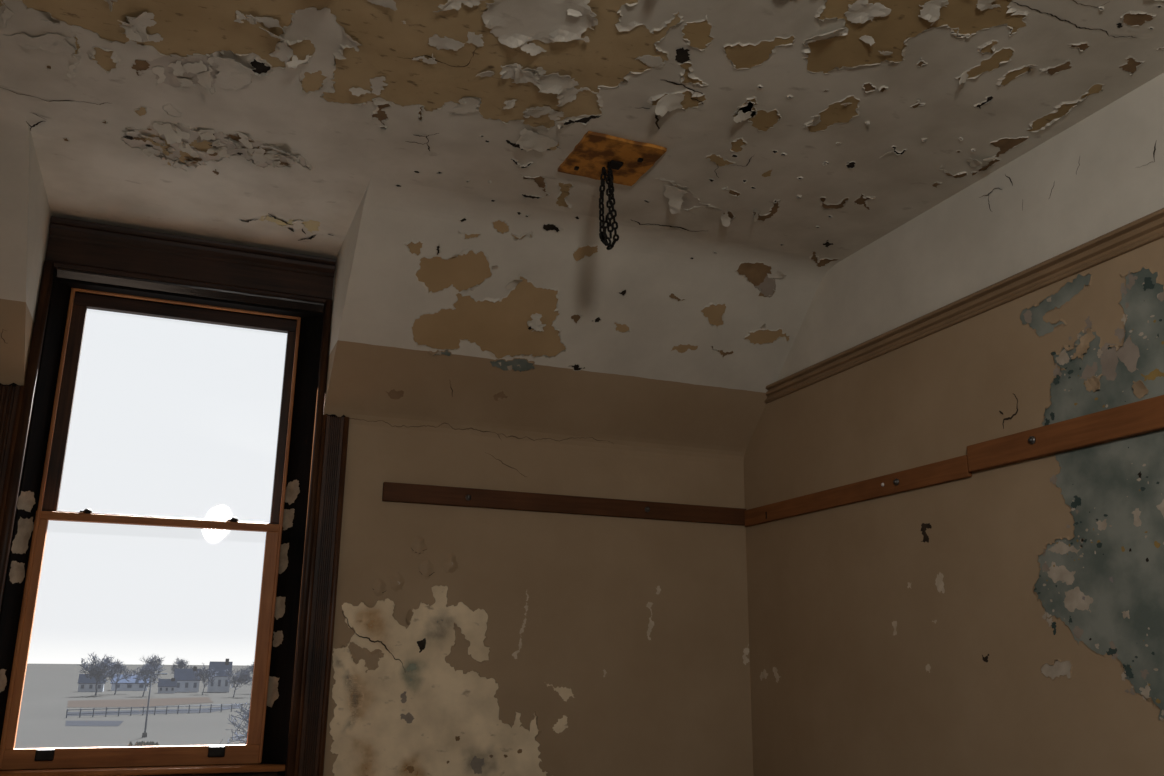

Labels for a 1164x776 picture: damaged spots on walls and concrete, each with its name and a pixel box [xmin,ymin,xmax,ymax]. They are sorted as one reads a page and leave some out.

peeling [1116,0,1164,28]
peeling [21,0,1106,227]
peeling [402,211,631,373]
peeling [700,302,727,328]
peeling [734,261,787,298]
peeling [1019,266,1164,426]
peeling [9,491,35,584]
peeling [273,596,286,647]
peeling [278,480,300,574]
peeling [1032,429,1164,721]
peeling [267,676,279,707]
flaking render [328,584,568,776]